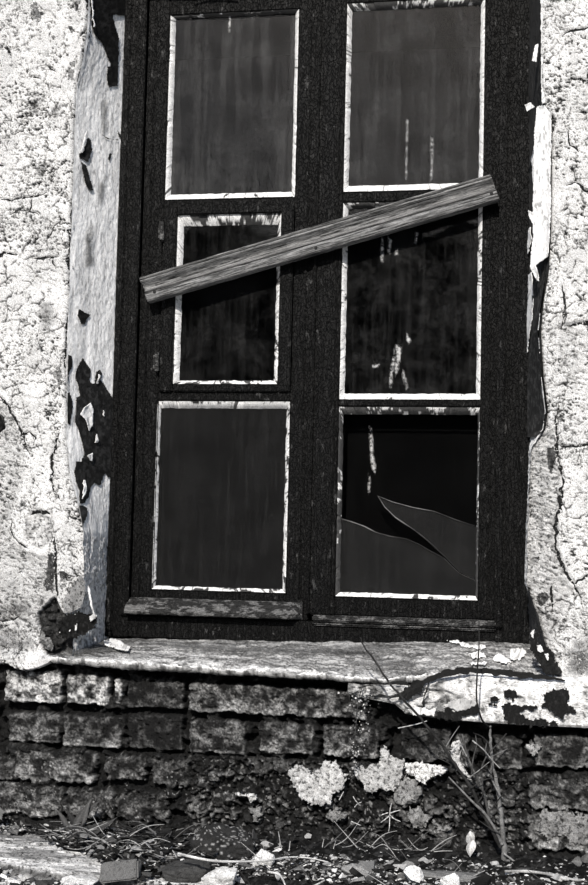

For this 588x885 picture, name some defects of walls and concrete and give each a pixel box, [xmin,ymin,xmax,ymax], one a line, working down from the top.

peeling [90,0,126,87]
crack [566,111,588,192]
crack [0,192,73,286]
flaking render [525,0,559,607]
crack [562,285,588,331]
crack [0,396,59,515]
peeling [51,355,113,524]
crack [537,403,588,611]
flaking render [25,514,100,652]
crack [374,667,565,716]
peeling [447,624,562,677]
peeling [488,688,577,728]